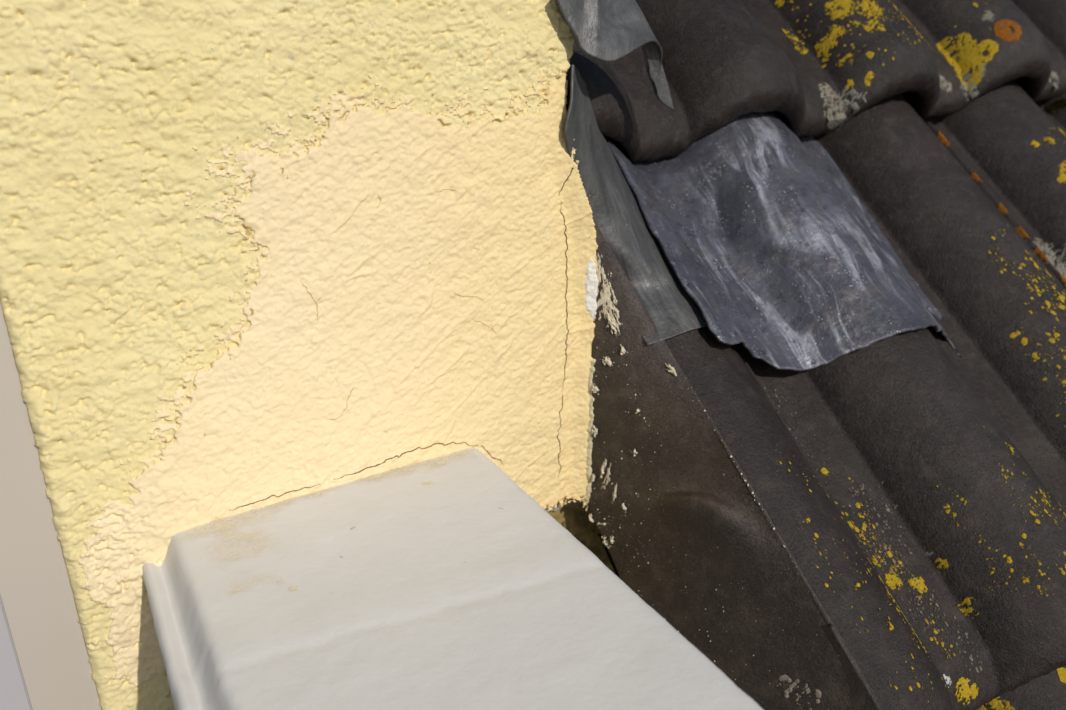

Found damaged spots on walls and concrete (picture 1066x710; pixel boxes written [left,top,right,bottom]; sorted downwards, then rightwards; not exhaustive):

crack [557,165,574,477]
crack [234,442,503,510]
spalling [545,359,596,513]